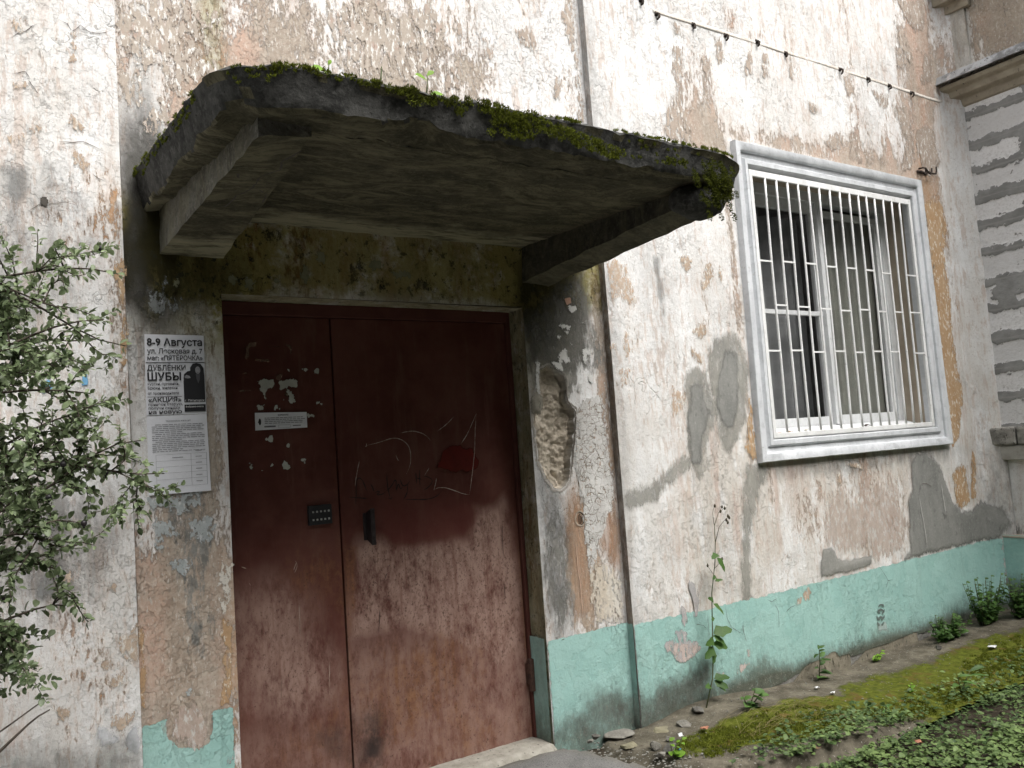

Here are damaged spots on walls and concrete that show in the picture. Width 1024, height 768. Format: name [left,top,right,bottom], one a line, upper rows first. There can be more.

peeling [326,0,464,92]
peeling [515,26,537,56]
peeling [561,0,586,123]
peeling [663,22,692,143]
peeling [701,38,725,104]
peeling [743,51,769,78]
spalling [71,151,90,173]
peeling [924,199,963,447]
spalling [530,324,594,492]
crack [550,393,617,613]
peeling [952,451,977,509]
peeling [215,559,234,616]